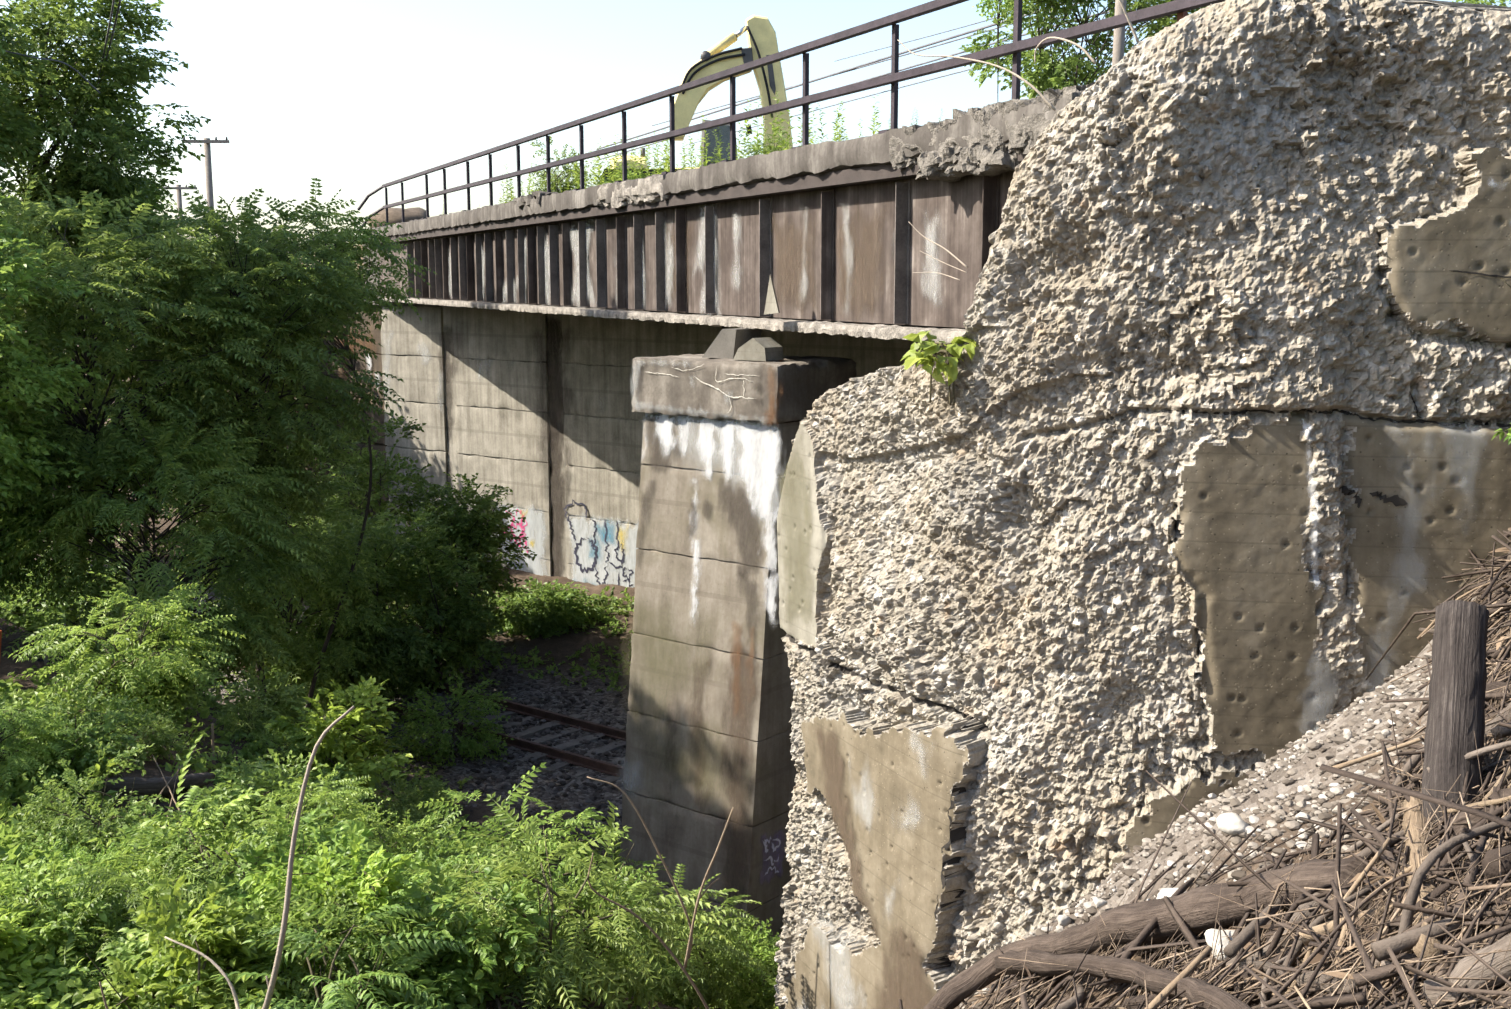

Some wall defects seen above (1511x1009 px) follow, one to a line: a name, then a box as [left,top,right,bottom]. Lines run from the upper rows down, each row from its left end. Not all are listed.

corrosion [664,229,690,298]
corrosion [776,226,816,306]
corrosion [838,217,882,312]
crack [1155,391,1511,427]
damp [650,414,779,623]
spalling [774,0,1511,1009]
crack [774,625,992,731]